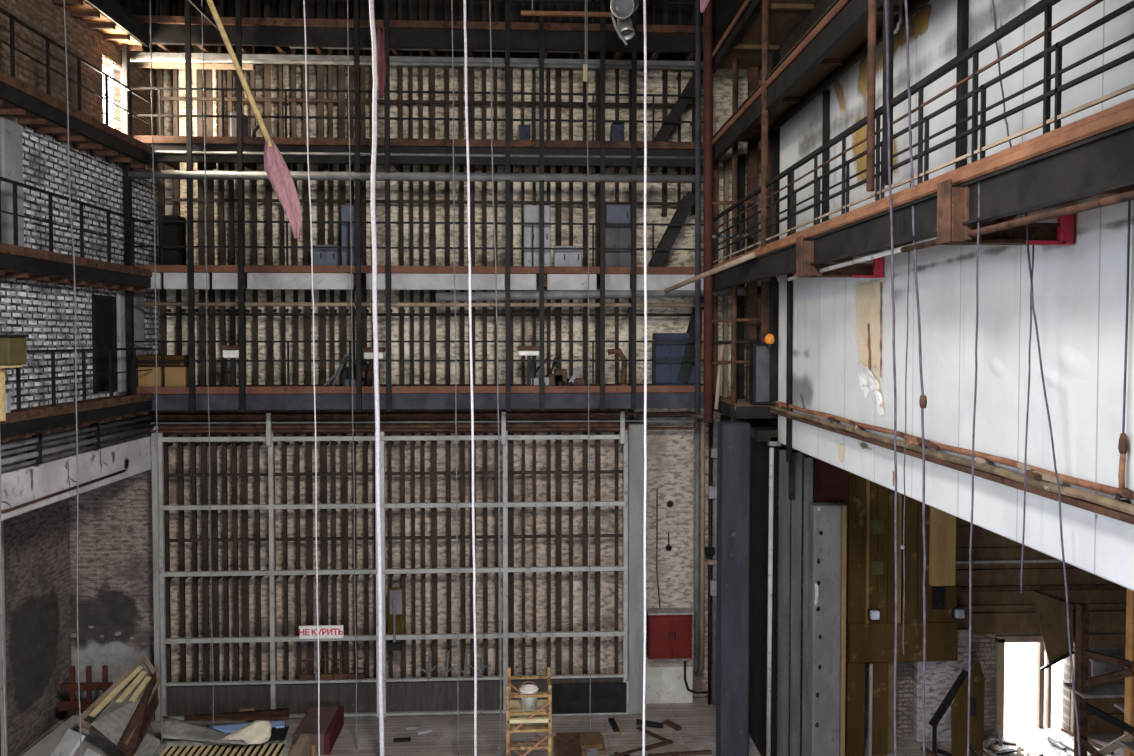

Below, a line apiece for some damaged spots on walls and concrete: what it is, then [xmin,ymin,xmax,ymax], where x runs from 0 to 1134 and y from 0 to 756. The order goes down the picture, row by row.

leakage [949,0,1025,51]
peeling [858,367,885,416]
leakage [10,589,59,713]